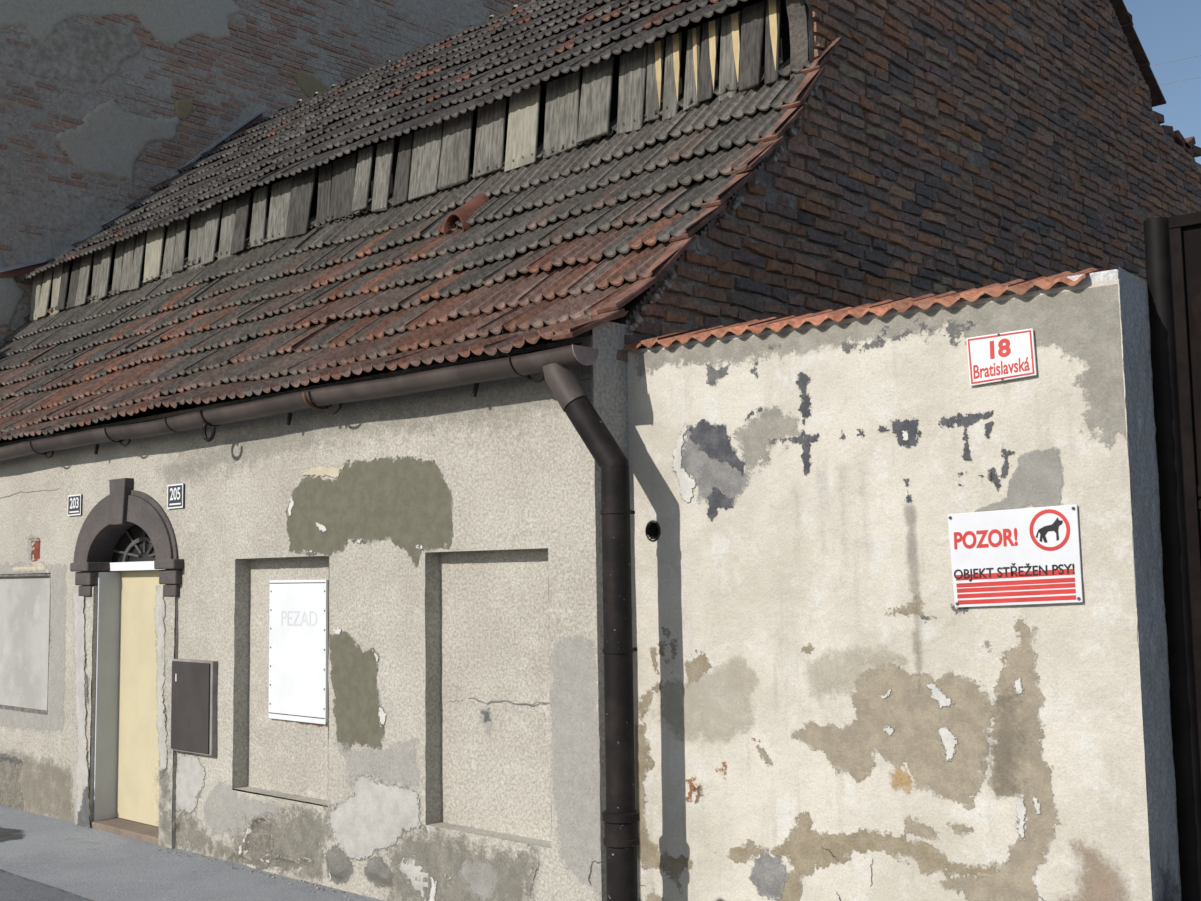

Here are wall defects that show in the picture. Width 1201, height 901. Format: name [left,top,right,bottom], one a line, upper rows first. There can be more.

flaking render [0,0,241,45]
flaking render [55,99,182,183]
flaking render [635,284,1126,449]
flaking render [285,454,453,568]
peeling [671,372,819,521]
peeling [938,410,994,486]
peeling [975,447,1063,512]
flaking render [329,627,387,752]
crack [450,698,549,706]
peeling [635,627,712,897]
peeling [715,616,1060,901]
flaking render [398,854,435,901]